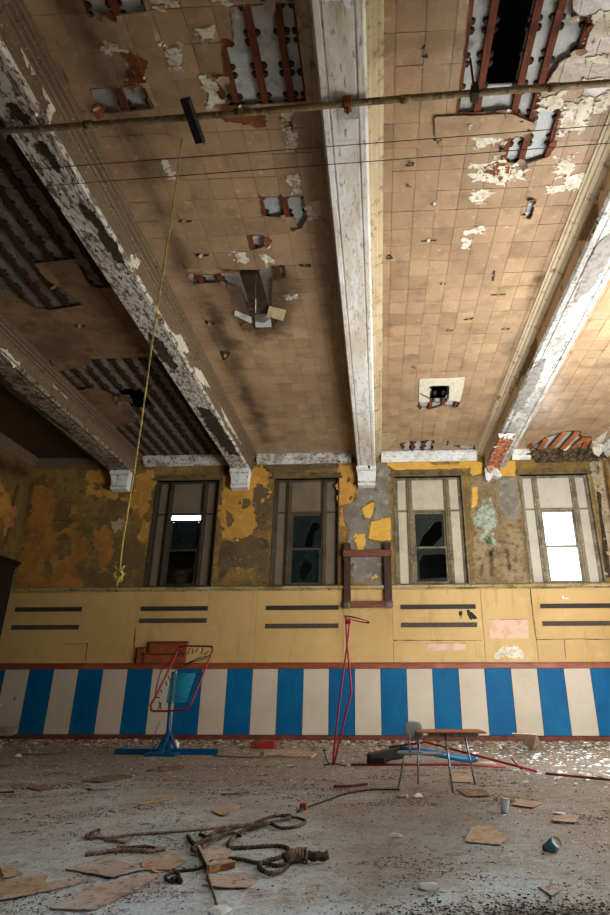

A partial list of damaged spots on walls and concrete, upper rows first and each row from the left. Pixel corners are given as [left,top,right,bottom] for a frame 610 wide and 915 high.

peeling [150,0,180,12]
peeling [582,10,610,45]
peeling [5,86,56,125]
peeling [533,90,610,137]
peeling [36,140,61,173]
peeling [193,366,210,387]
peeling [196,407,241,456]
peeling [592,427,610,449]
peeling [0,480,17,536]
peeling [12,469,157,589]
peeling [217,432,528,586]
peeling [590,460,610,563]